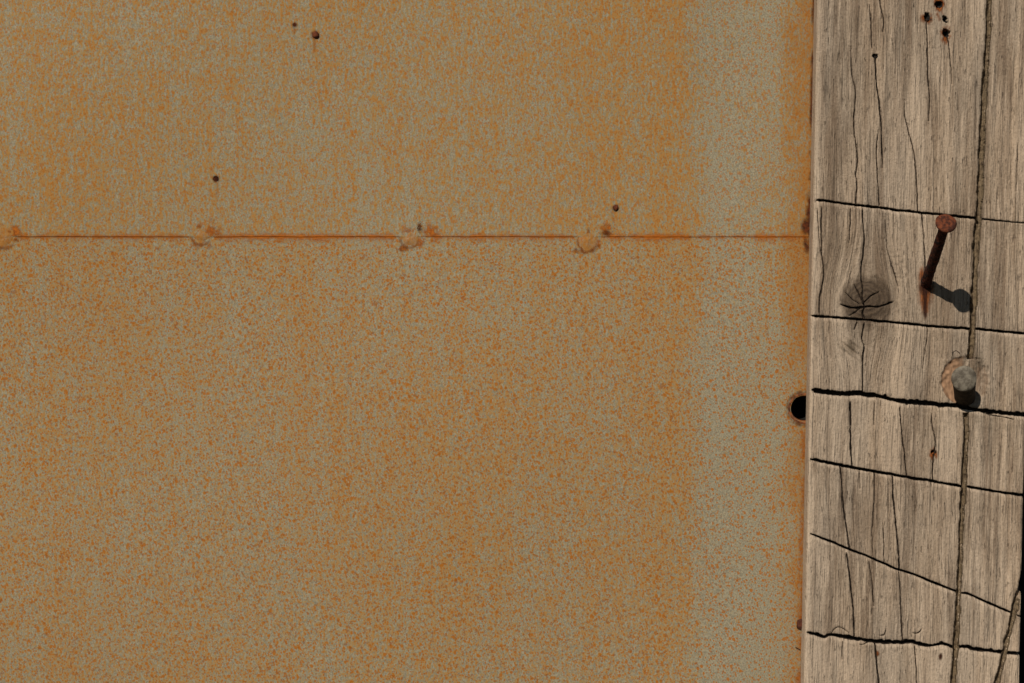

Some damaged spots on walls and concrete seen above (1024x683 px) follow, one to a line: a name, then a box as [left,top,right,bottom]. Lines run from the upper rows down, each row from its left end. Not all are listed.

rust [737,199,810,250]
rust [920,269,933,317]
crack [817,0,952,683]